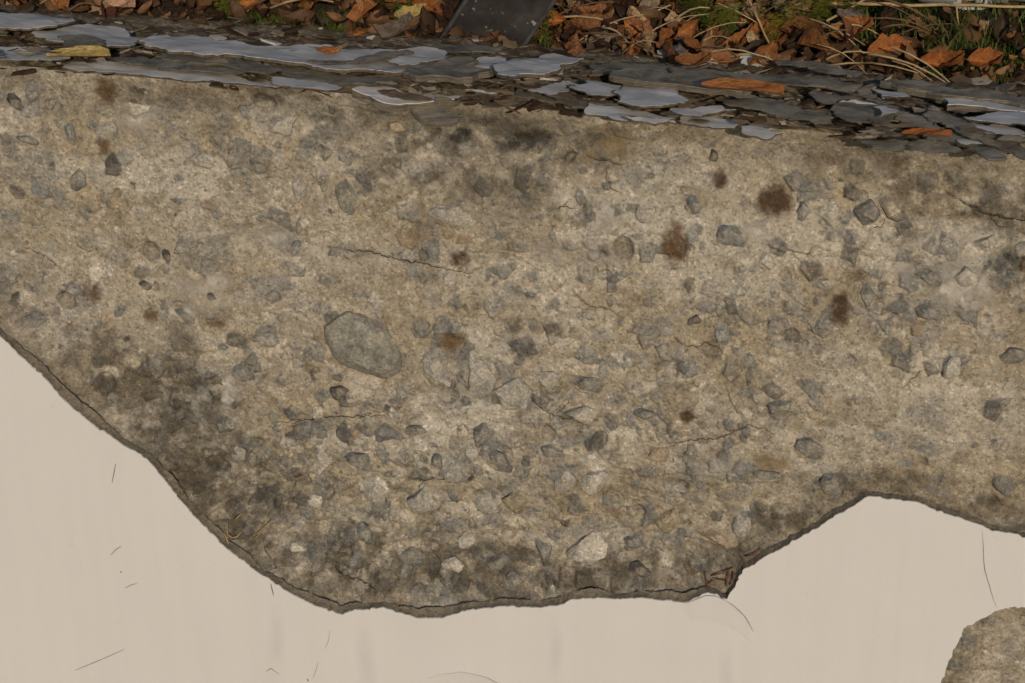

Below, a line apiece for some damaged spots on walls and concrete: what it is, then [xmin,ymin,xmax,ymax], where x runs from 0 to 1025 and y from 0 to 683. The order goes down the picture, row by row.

peeling [0,12,503,92]
peeling [442,53,763,130]
peeling [773,60,864,79]
rust [758,187,791,215]
crack [331,247,479,274]
rust [663,225,687,260]
spalling [0,66,1025,609]
spalling [941,606,1025,683]